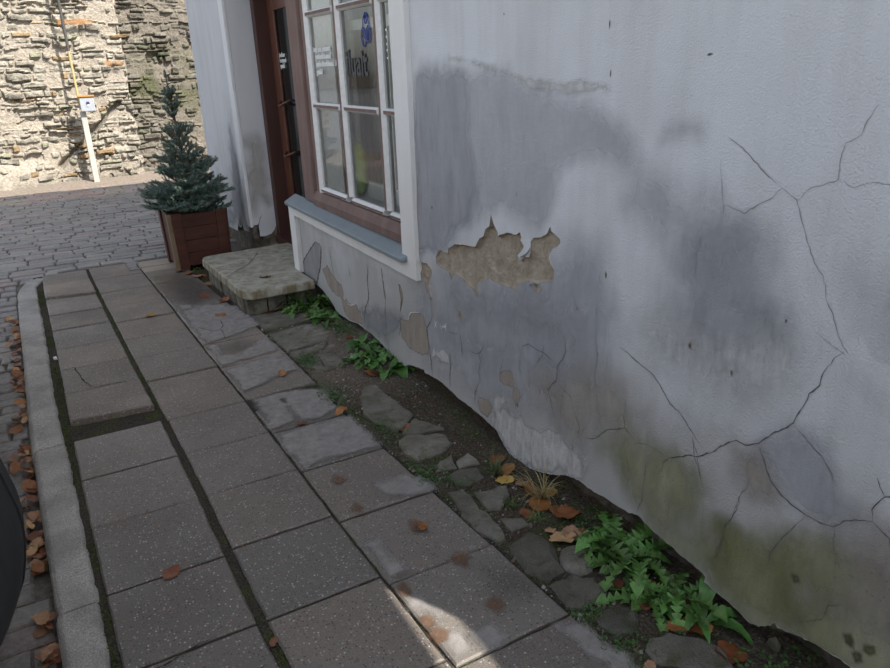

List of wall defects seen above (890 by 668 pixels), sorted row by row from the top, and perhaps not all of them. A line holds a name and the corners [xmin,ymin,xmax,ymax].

damp [414,64,626,249]
peeling [323,266,362,324]
crack [303,242,403,349]
crack [427,306,483,392]
spalling [400,216,560,355]
crack [519,104,890,564]
mould [844,634,875,662]